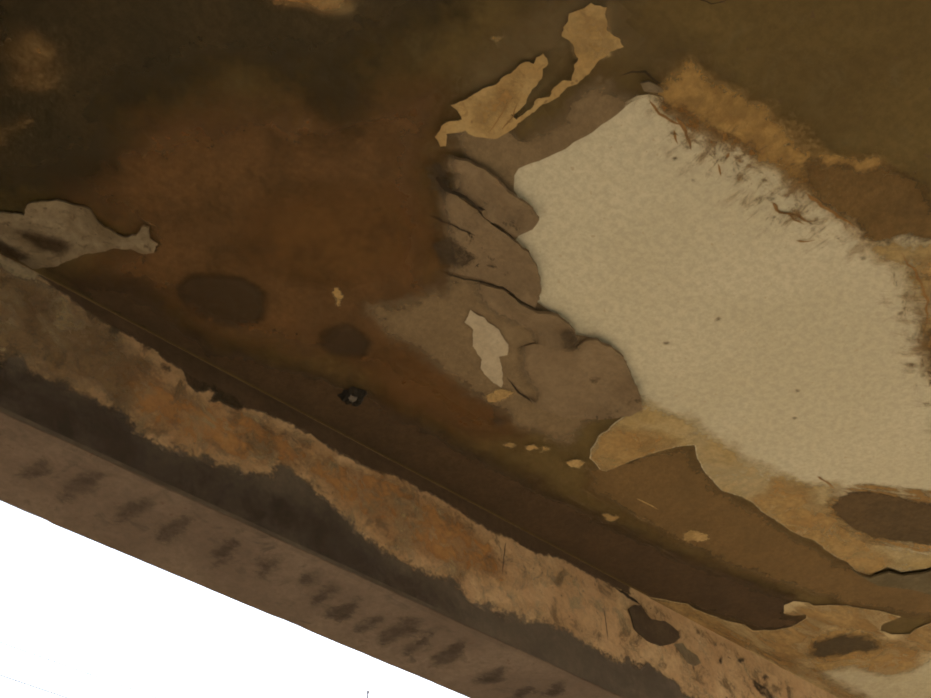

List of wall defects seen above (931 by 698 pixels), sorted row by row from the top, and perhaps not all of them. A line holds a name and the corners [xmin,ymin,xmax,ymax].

leakage [0,0,463,201]
rust [649,55,931,243]
peeling [0,199,158,283]
spalling [332,287,344,306]
crack [431,177,506,236]
crack [440,270,514,295]
spalling [367,0,931,595]
leakage [0,264,801,698]
leakage [817,476,931,552]
spalling [616,588,931,698]
leakage [805,629,887,662]